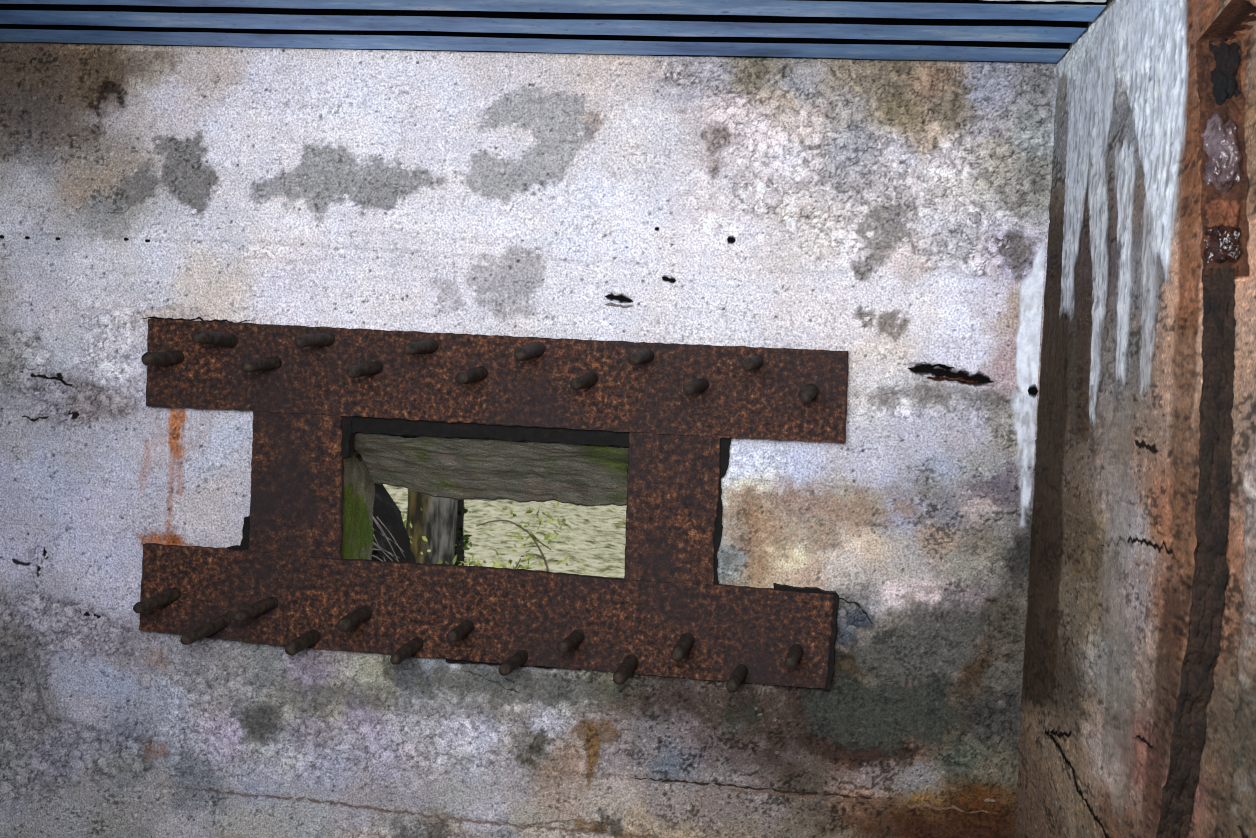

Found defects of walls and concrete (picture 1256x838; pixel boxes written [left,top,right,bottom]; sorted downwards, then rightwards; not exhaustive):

damp [88,81,127,115]
damp [985,0,1186,421]
corrosion [169,409,185,457]
damp [1014,243,1045,512]
corrosion [1144,0,1256,838]
corrosion [140,534,192,546]
corrosion [724,490,914,581]
corrosion [585,725,599,785]
crack [1045,729,1111,838]
crack [1135,735,1153,748]